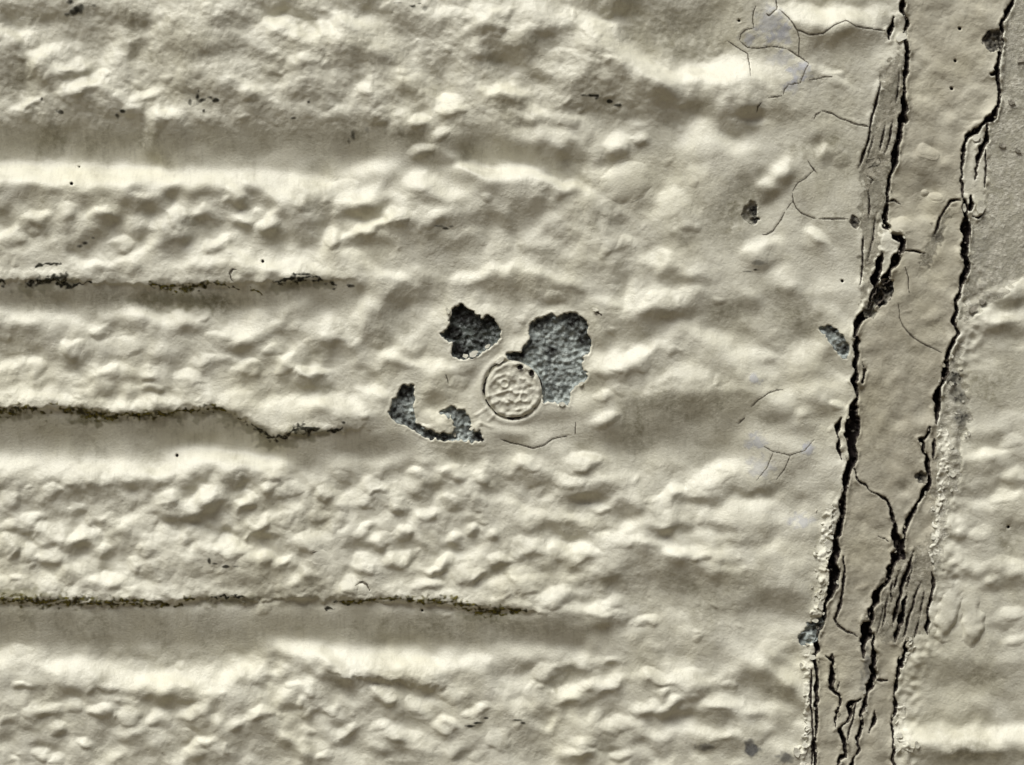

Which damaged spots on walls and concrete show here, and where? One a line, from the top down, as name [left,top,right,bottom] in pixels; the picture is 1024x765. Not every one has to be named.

spalling [742,200,760,225]
spalling [440,304,501,360]
spalling [495,308,602,407]
spalling [819,325,850,359]
crack [728,0,1014,765]
spalling [388,384,484,444]